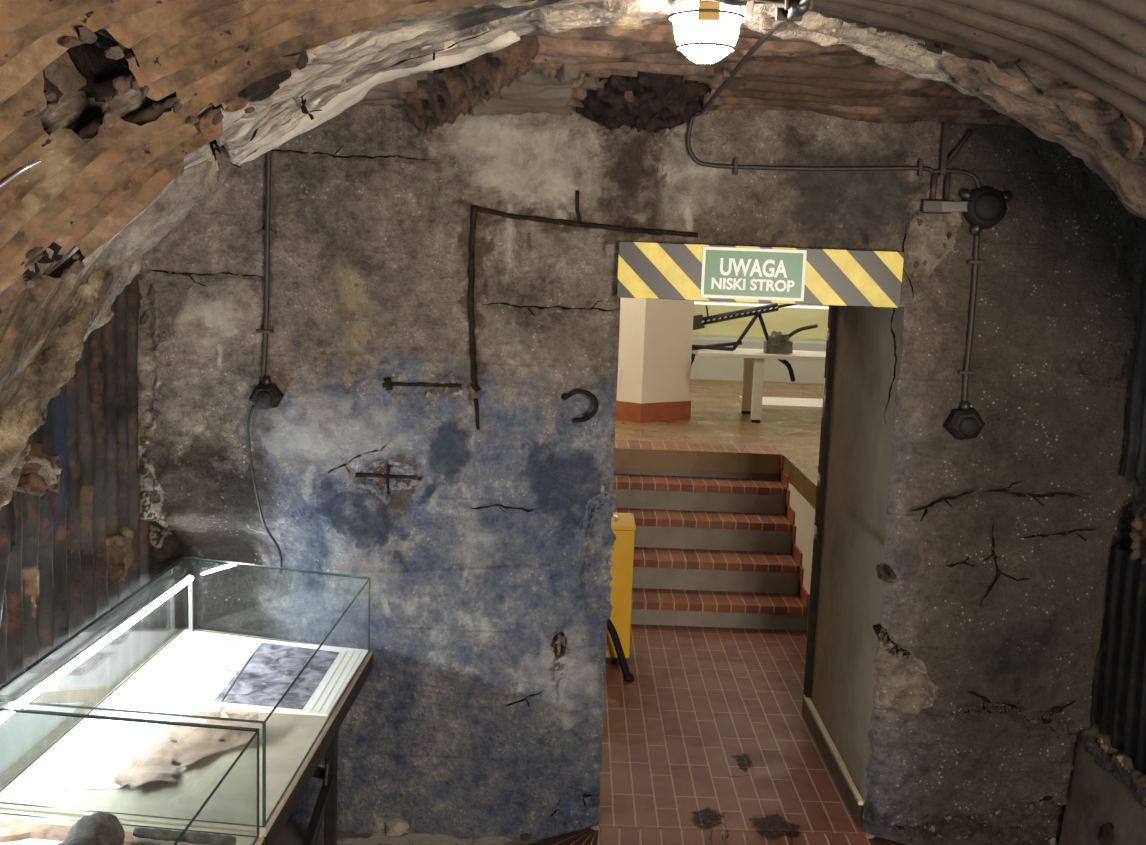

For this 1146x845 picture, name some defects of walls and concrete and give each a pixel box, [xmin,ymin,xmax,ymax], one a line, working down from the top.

spalling [739,4,955,82]
peeling [905,188,962,277]
spalling [0,0,676,583]
crack [946,524,1030,607]
crack [910,481,1087,521]
crack [1023,528,1099,541]
spalling [1129,504,1146,565]
spalling [872,629,939,714]
damp [729,753,752,777]
spalling [1085,732,1146,808]
damp [691,808,729,845]
damp [748,814,800,845]